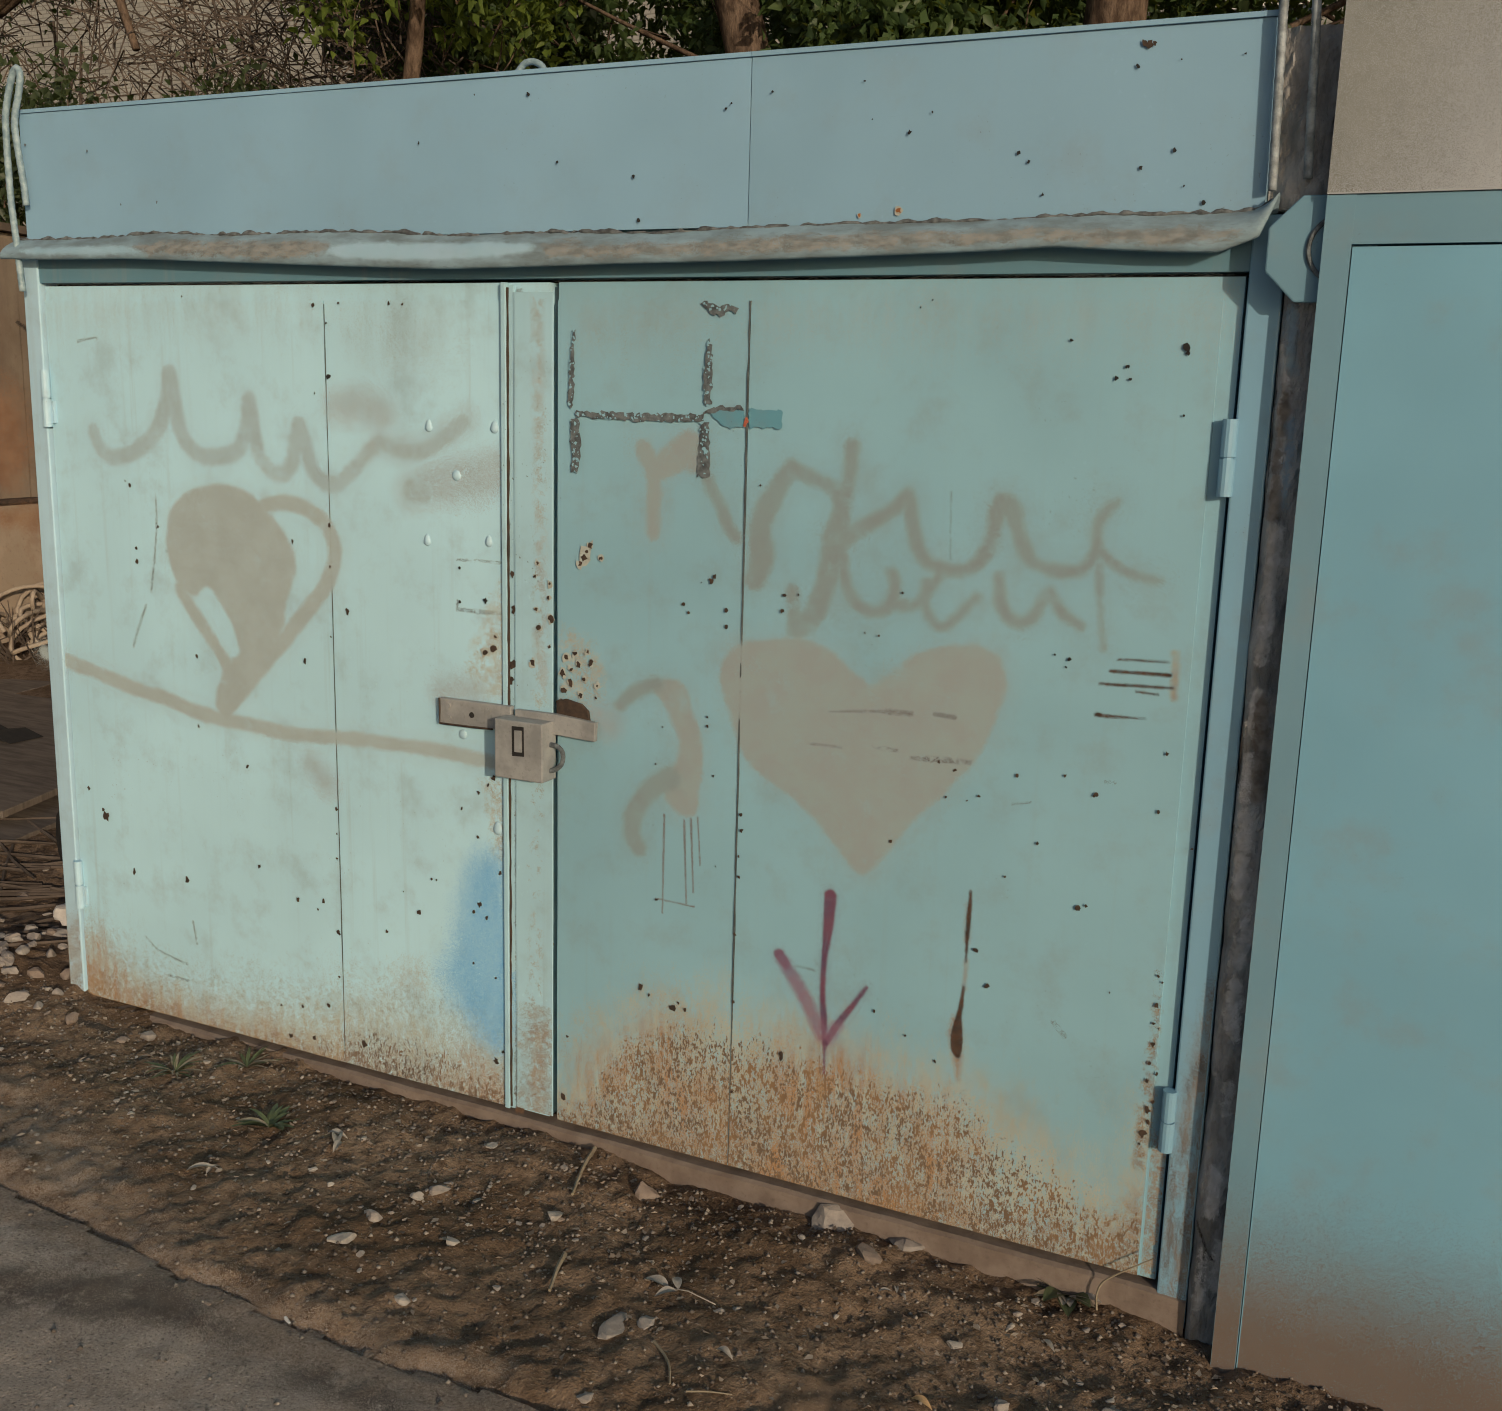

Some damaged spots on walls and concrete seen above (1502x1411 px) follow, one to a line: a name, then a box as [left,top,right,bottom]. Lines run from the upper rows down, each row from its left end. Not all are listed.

corrosion [514,287,554,708]
peeling [567,329,783,478]
peeling [701,301,739,317]
corrosion [84,784,1166,1278]